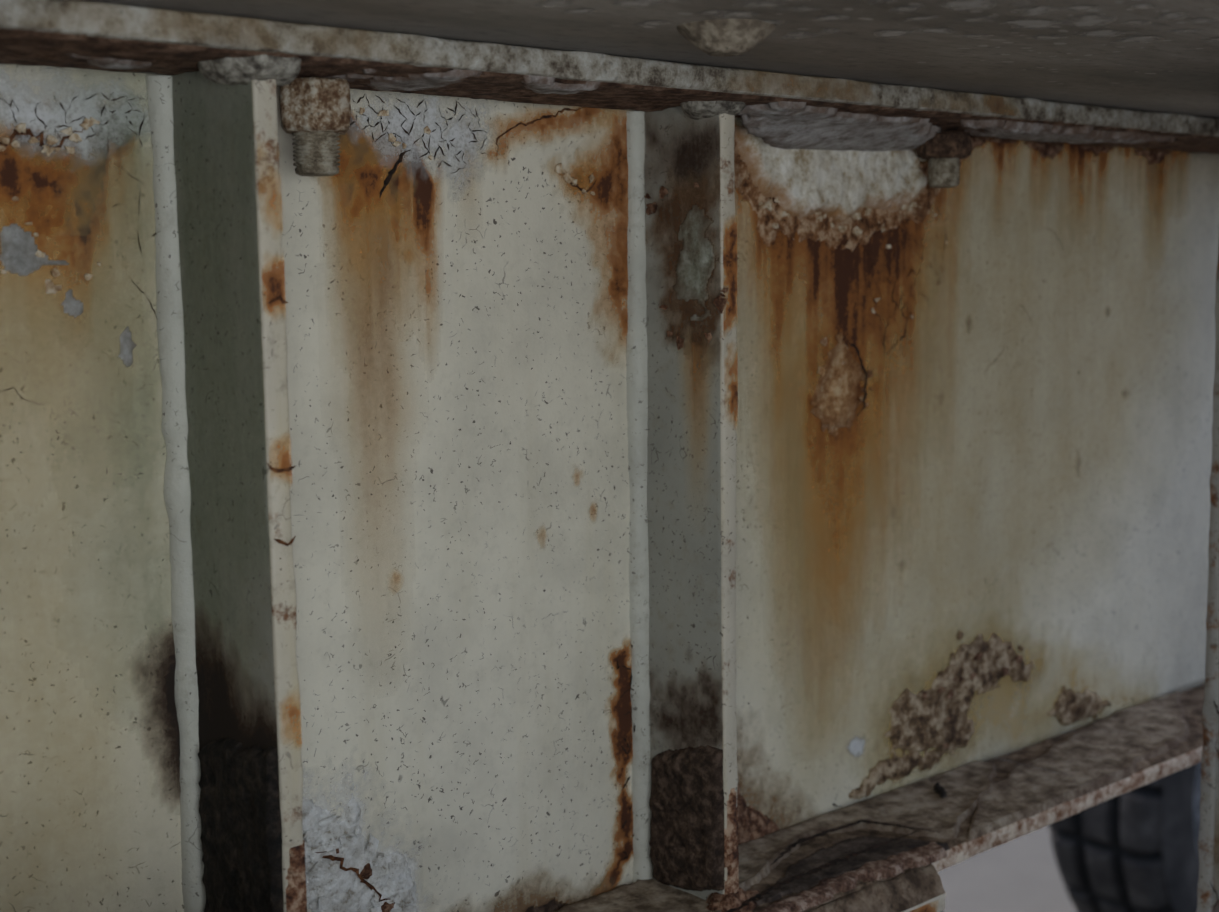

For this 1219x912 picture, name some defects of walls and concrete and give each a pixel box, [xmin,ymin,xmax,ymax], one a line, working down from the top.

rust [0,28,1219,644]
spalling [644,101,942,416]
peeling [960,119,1175,166]
peeling [302,779,418,912]
rust [492,629,1205,912]
spalling [934,782,947,798]